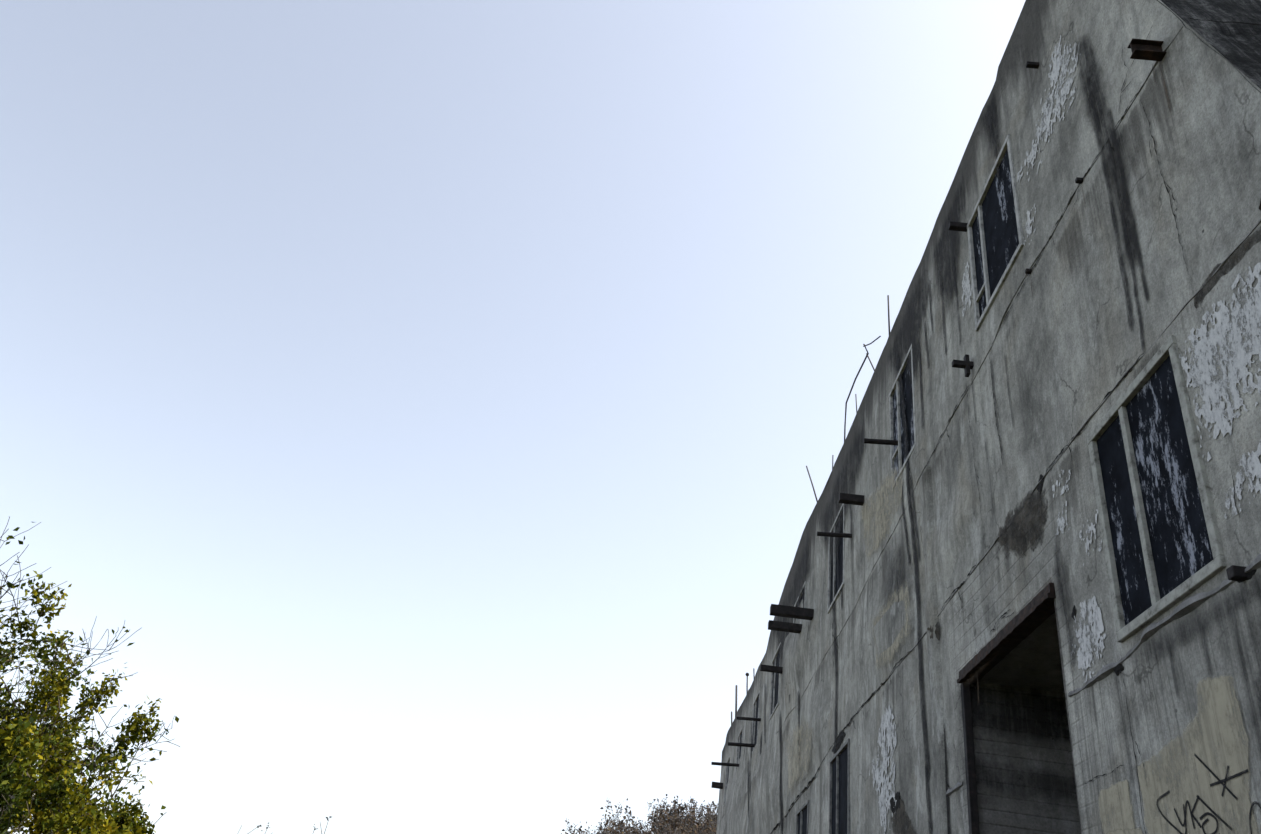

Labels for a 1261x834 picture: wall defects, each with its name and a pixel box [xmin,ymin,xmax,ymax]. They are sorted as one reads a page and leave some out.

peeling [1014,30,1081,182]
water stain [1080,39,1148,349]
peeling [1177,229,1261,461]
peeling [1214,439,1261,519]
peeling [1071,596,1124,684]
peeling [869,705,916,834]